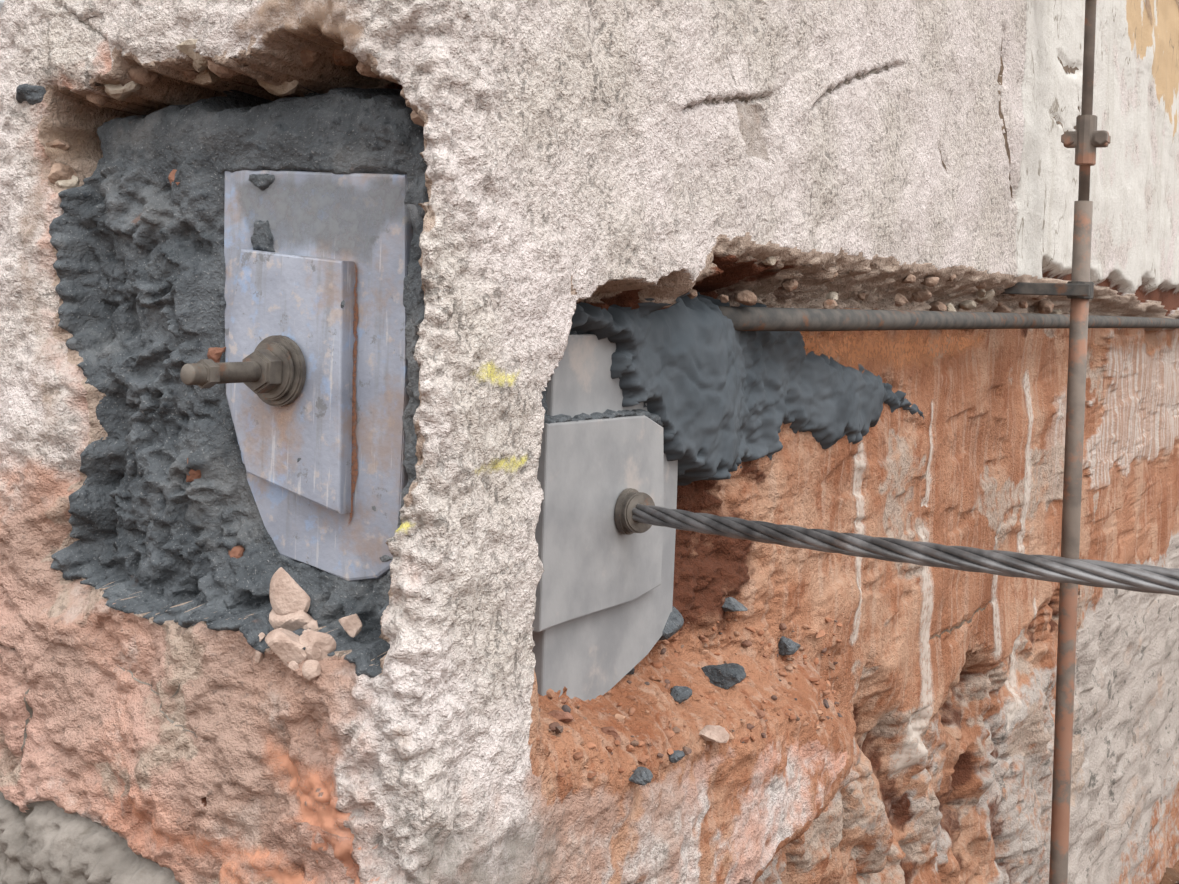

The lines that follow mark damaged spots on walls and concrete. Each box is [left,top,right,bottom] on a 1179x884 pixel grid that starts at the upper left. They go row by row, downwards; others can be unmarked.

crack [61,5,106,39]
spalling [38,21,433,305]
crack [687,17,766,108]
crack [813,65,892,107]
crack [997,45,1013,198]
flaking render [539,231,1071,414]
water stain [853,443,865,534]
water stain [1018,374,1033,553]
spalling [523,479,777,788]
spalling [737,582,1060,884]
water stain [892,566,932,775]
water stain [992,575,1022,728]